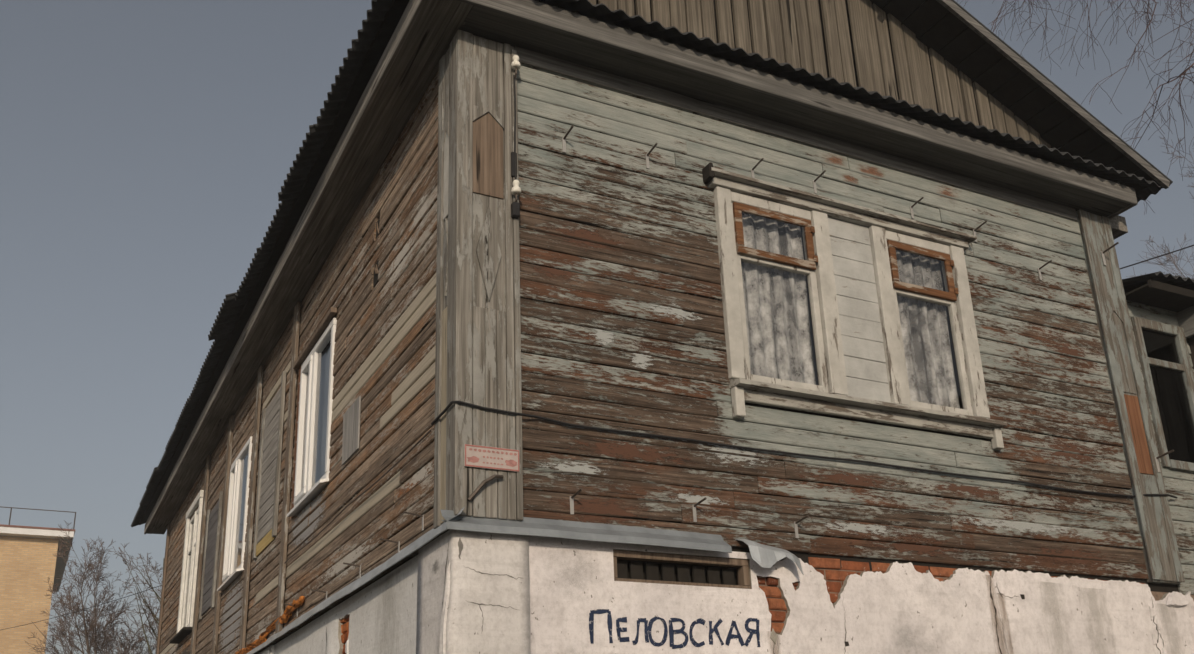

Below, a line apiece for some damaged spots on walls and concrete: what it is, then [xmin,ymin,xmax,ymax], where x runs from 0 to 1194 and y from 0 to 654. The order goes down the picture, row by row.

peeling [321,536,377,584]
spalling [808,557,890,603]
spalling [913,565,957,581]
spalling [757,577,787,644]
spalling [340,616,350,654]